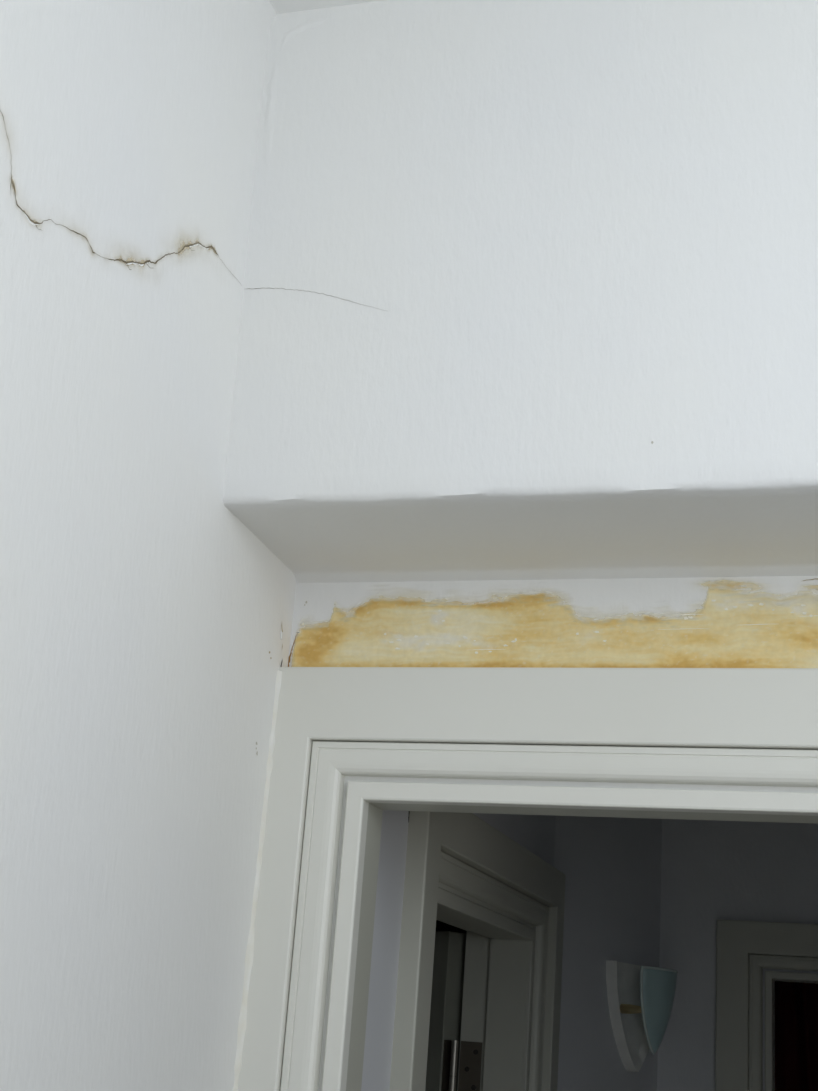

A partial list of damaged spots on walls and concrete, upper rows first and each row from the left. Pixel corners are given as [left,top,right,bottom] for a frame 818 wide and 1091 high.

crack [1,112,387,311]